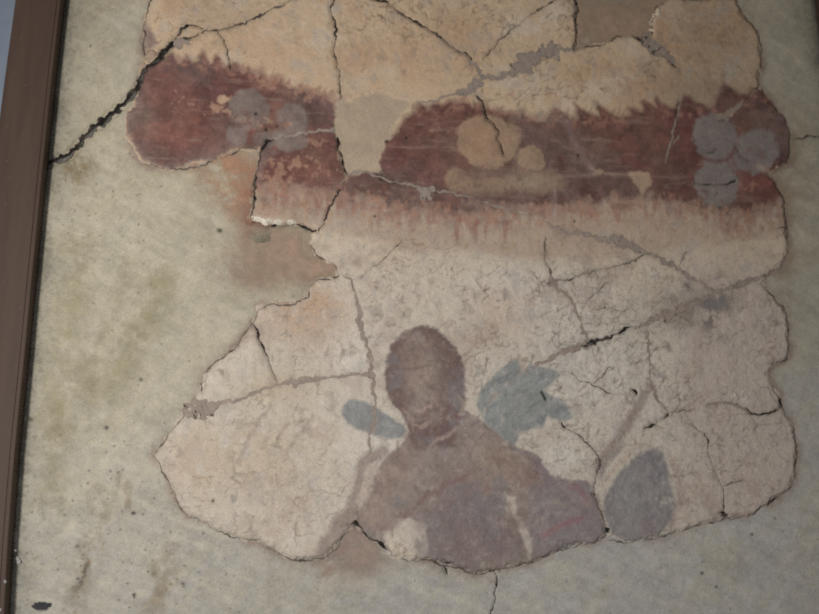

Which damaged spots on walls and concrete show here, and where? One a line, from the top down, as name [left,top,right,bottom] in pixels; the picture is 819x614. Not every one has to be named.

crack [48,0,289,167]
crack [330,0,341,95]
crack [375,0,676,155]
crack [665,101,680,165]
crack [716,2,762,121]
crack [146,128,797,614]